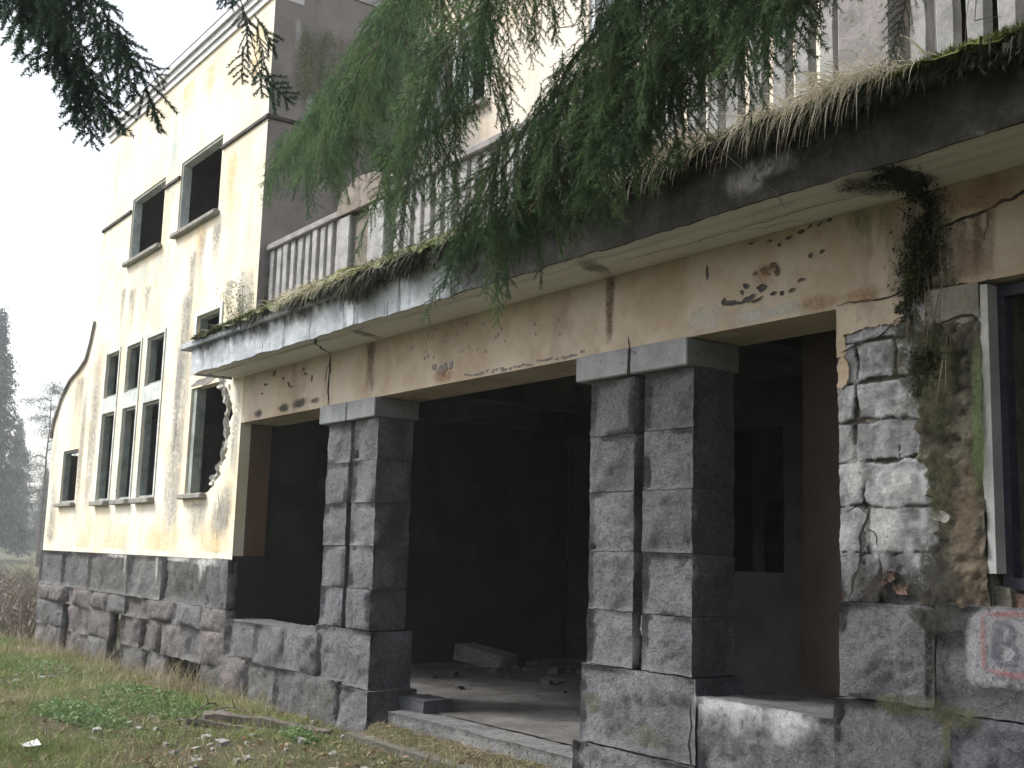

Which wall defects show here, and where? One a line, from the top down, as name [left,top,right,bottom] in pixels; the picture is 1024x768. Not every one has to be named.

crack [937,190,1024,238]
water stain [190,224,220,284]
water stain [583,263,614,335]
peeling [721,262,806,306]
crack [314,339,331,404]
water stain [76,379,98,493]
flaking render [191,377,232,486]
water stain [151,299,342,573]
crack [846,506,877,597]